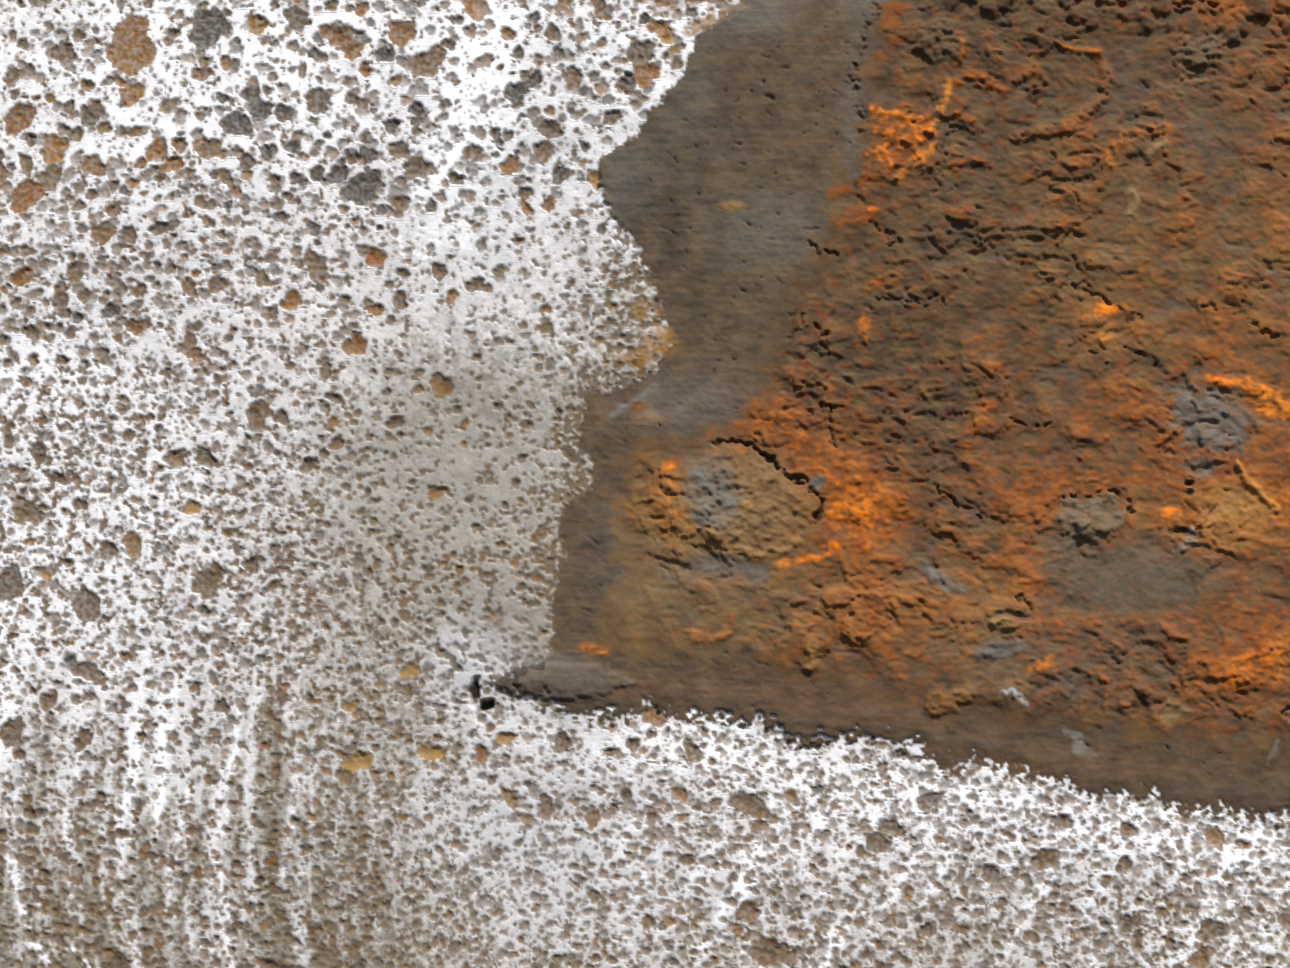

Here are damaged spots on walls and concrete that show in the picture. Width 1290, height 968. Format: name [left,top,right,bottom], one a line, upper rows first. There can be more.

spalling [615,19,678,92]
spalling [601,109,625,127]
spalling [537,318,556,336]
crack [804,401,845,450]
rust [540,0,1290,834]
peeling [1153,374,1264,480]
crack [715,437,826,526]
peeling [1032,489,1237,627]
hole [473,730,519,768]
hole [552,730,574,756]
spalling [623,704,671,755]
spalling [680,736,704,764]